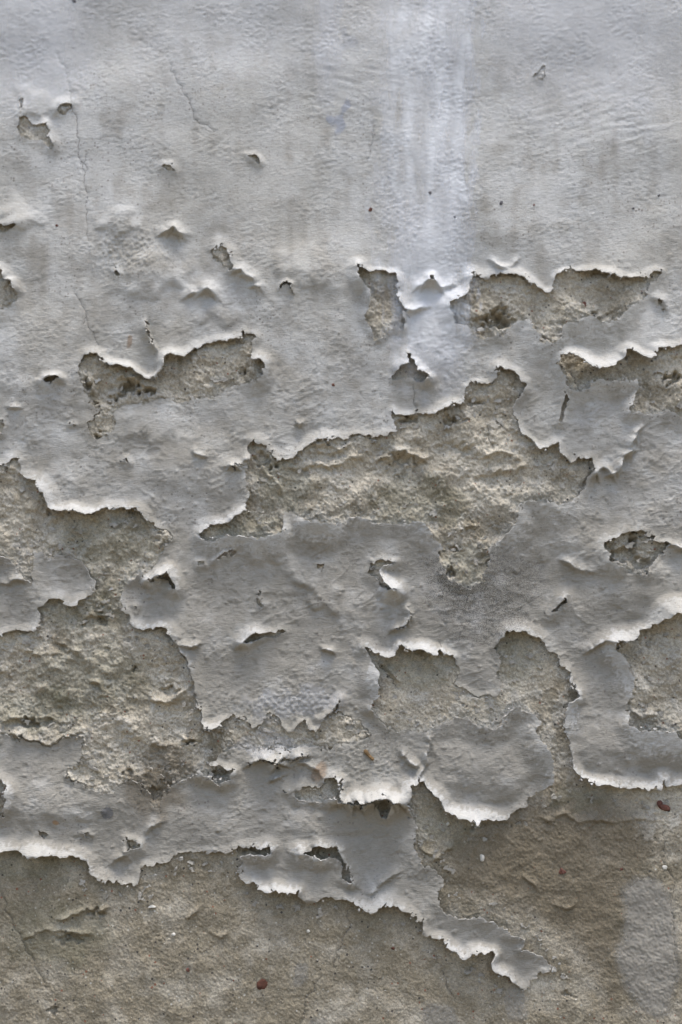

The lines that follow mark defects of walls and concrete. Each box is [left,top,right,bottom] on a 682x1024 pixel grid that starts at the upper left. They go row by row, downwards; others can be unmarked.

spalling [17,96,81,157]
spalling [0,261,26,309]
peeling [178,244,297,304]
peeling [5,401,24,412]
spalling [36,316,277,440]
spalling [189,255,682,589]
spalling [0,451,682,1024]